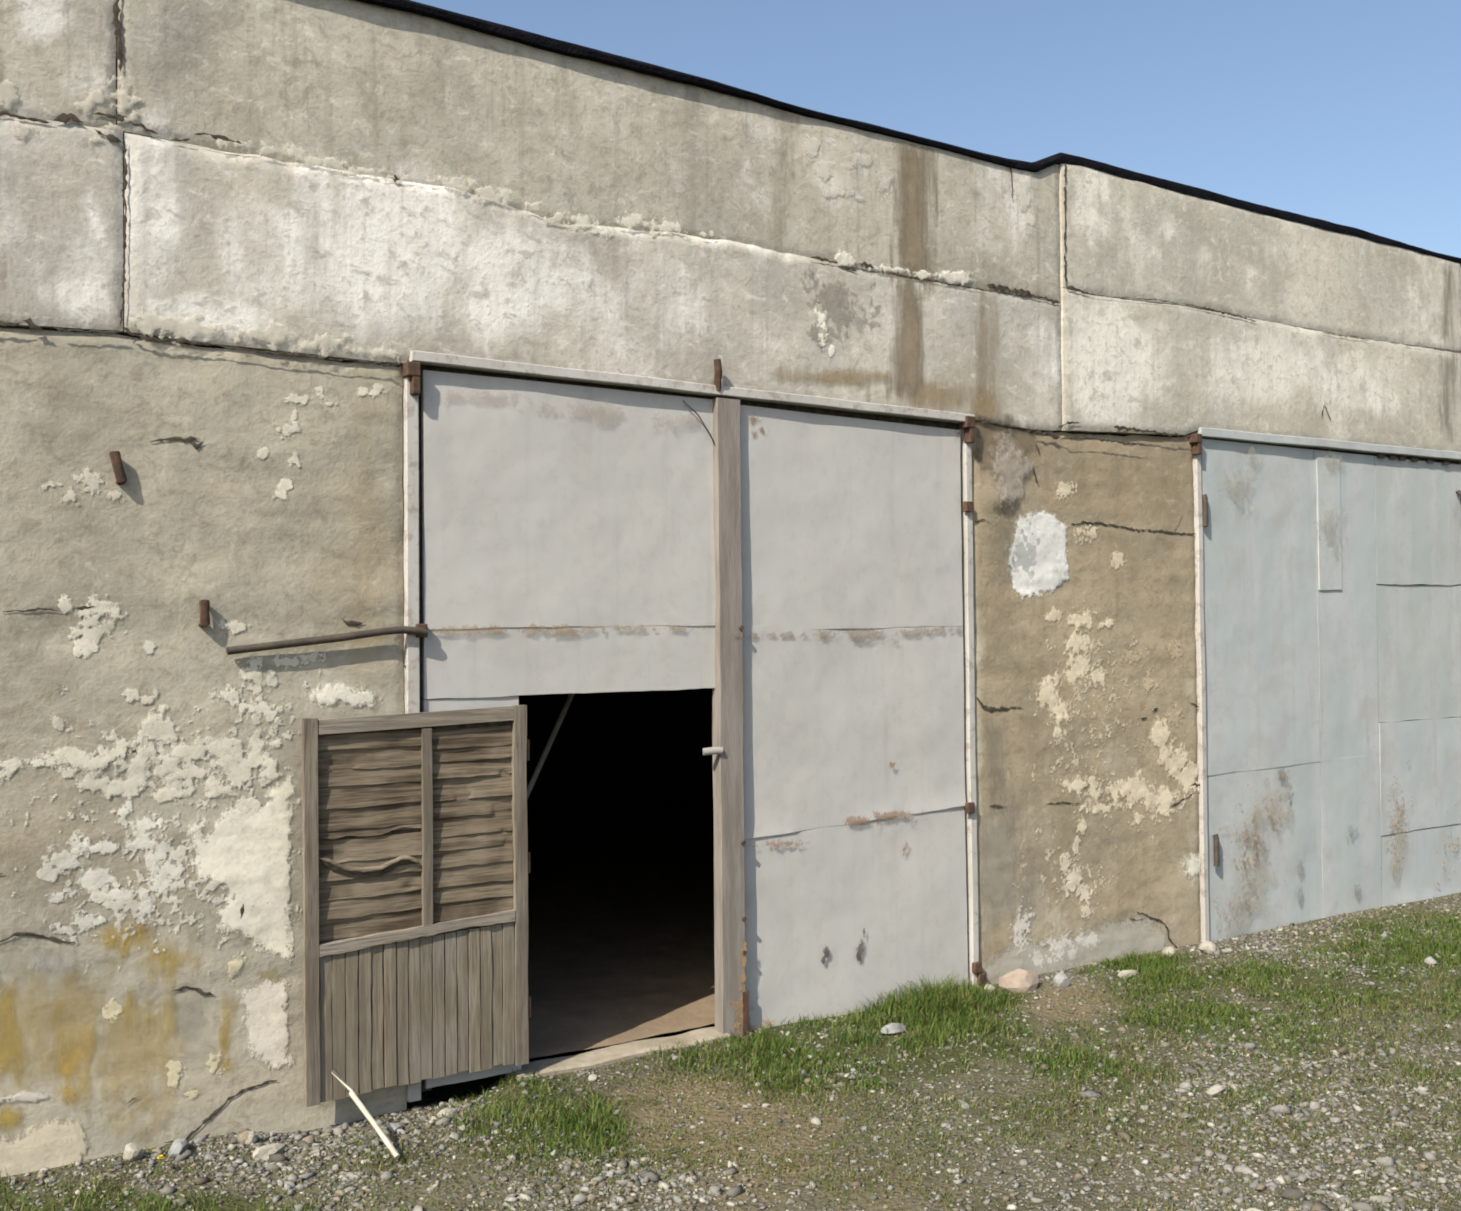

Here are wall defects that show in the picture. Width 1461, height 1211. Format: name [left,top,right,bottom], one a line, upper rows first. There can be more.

crack [112,0,124,72]
crack [0,110,242,328]
spalling [216,139,714,239]
spalling [835,248,974,286]
water stain [814,141,1033,475]
crack [1071,515,1195,535]
peeling [58,594,128,658]
rust [483,624,686,636]
peeling [999,481,1199,993]
rust [845,811,914,825]
peeling [0,651,381,1069]
crack [164,1080,277,1143]